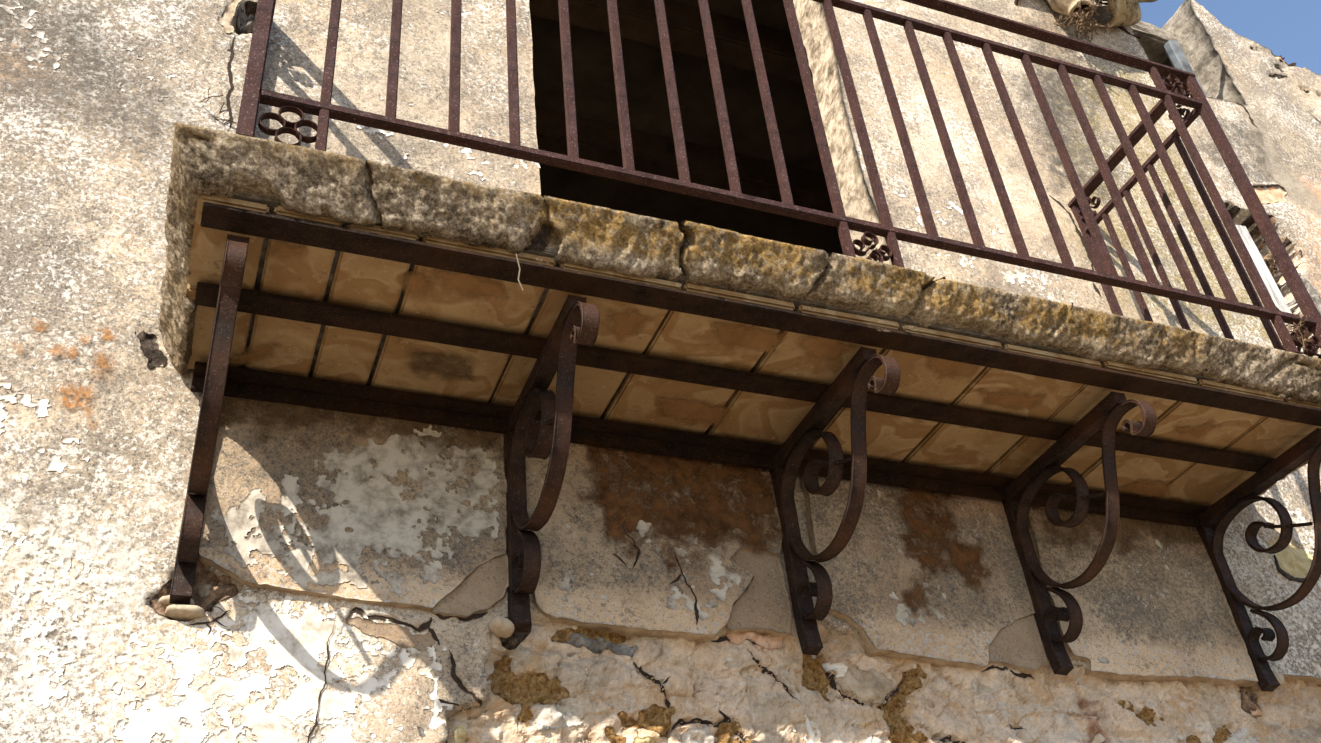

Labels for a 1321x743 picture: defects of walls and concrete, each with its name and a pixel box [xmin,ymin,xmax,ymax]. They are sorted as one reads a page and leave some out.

spalling [217,0,258,35]
crack [221,12,235,131]
corrosion [50,329,112,373]
peeling [0,381,51,434]
corrosion [59,384,94,427]
peeling [36,436,89,473]
crack [612,520,640,569]
spalling [103,425,1321,743]
peeling [0,537,93,709]
crack [670,552,799,701]
crack [307,599,489,743]
crack [825,672,899,707]